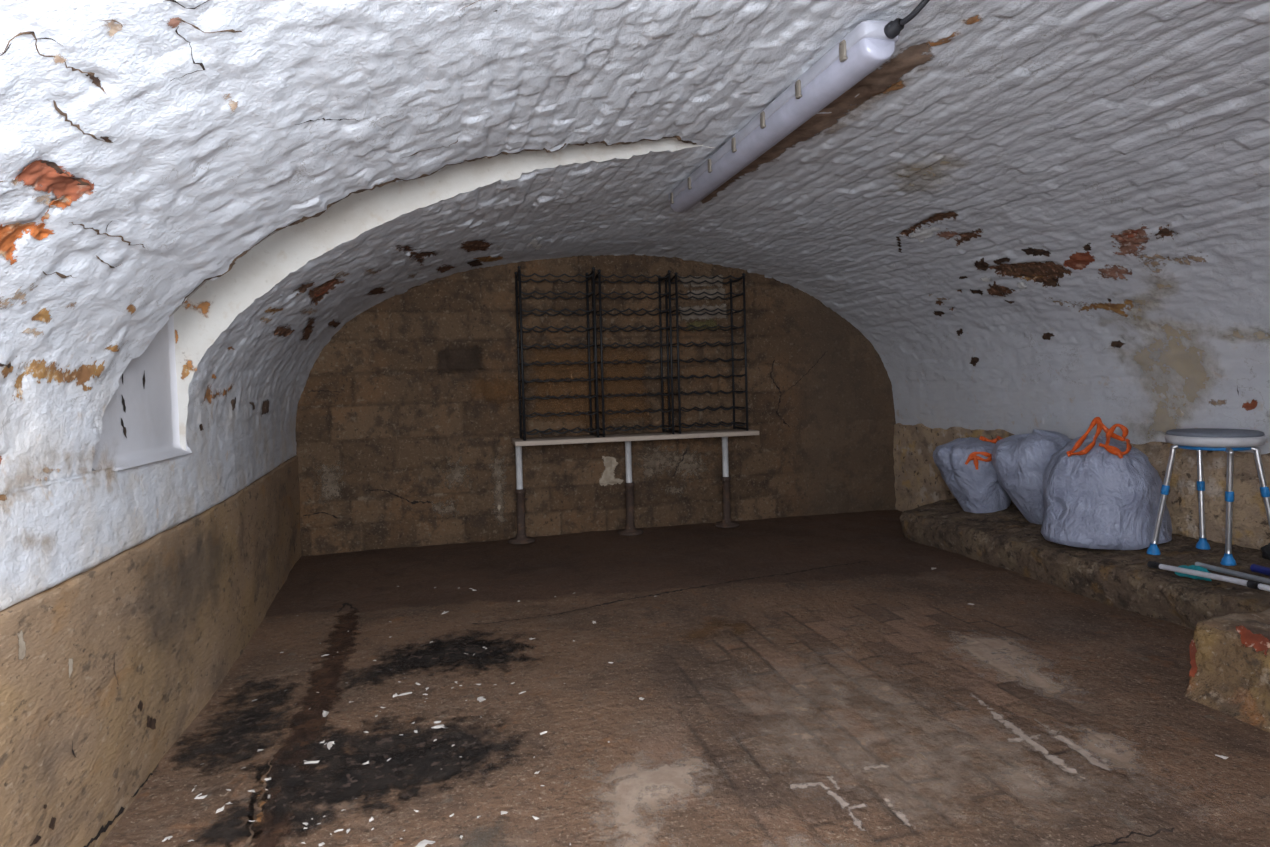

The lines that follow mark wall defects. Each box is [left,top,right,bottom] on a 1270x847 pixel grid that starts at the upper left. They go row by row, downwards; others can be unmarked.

crack [0,31,108,96]
crack [165,0,242,81]
spalling [0,159,94,265]
spalling [260,271,349,341]
spalling [367,269,386,297]
spalling [396,239,503,278]
spalling [896,211,983,253]
spalling [929,224,1206,317]
peeling [0,345,120,400]
leakage [393,642,512,669]
leakage [321,744,485,801]
crack [1089,828,1175,847]